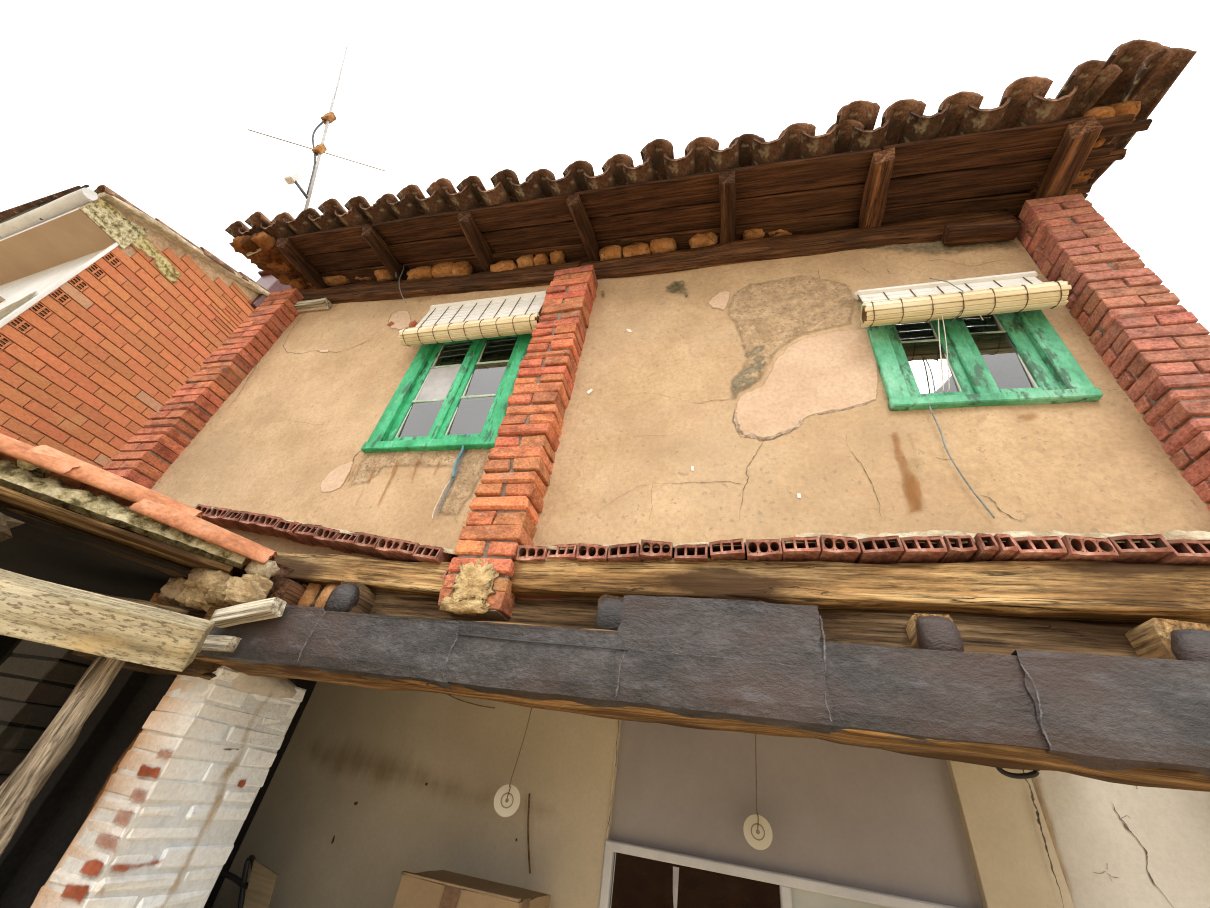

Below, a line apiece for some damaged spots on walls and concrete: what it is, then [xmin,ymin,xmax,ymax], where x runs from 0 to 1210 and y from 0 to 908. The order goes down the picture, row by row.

flaking render [708,276,878,442]
spalling [320,448,488,515]
crack [1023,770,1064,907]
crack [1113,805,1174,908]